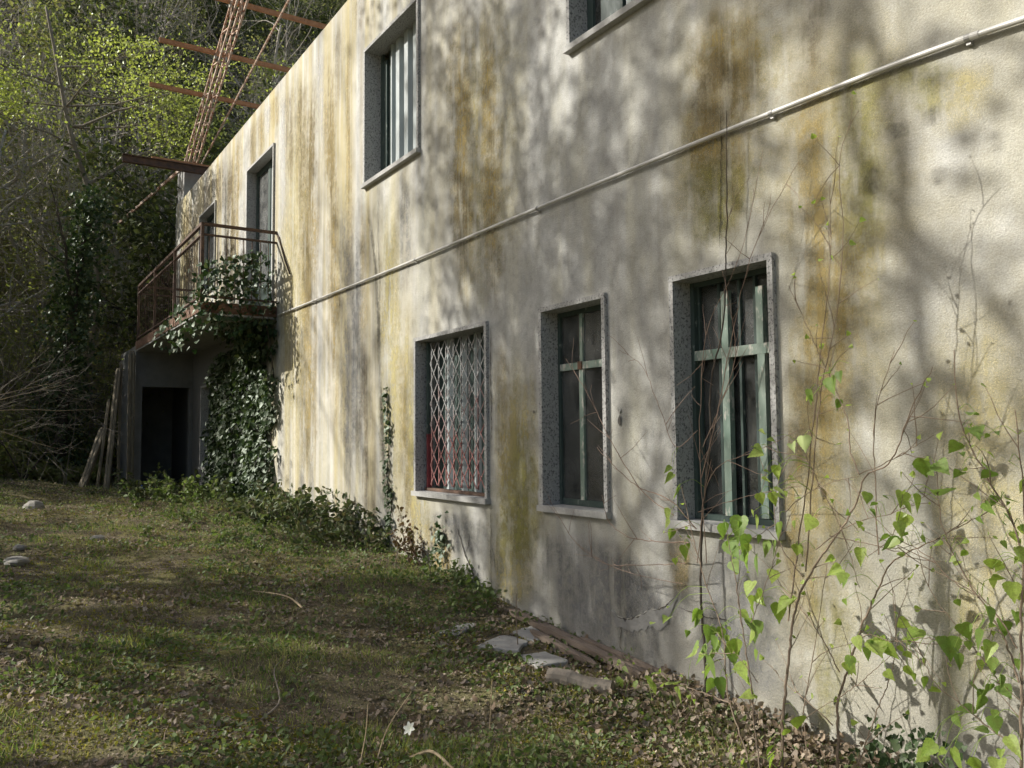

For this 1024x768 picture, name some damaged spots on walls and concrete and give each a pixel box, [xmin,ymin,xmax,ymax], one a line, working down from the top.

leakage [203,152,243,266]
leakage [261,99,350,446]
leakage [328,206,427,534]
leakage [497,400,538,598]